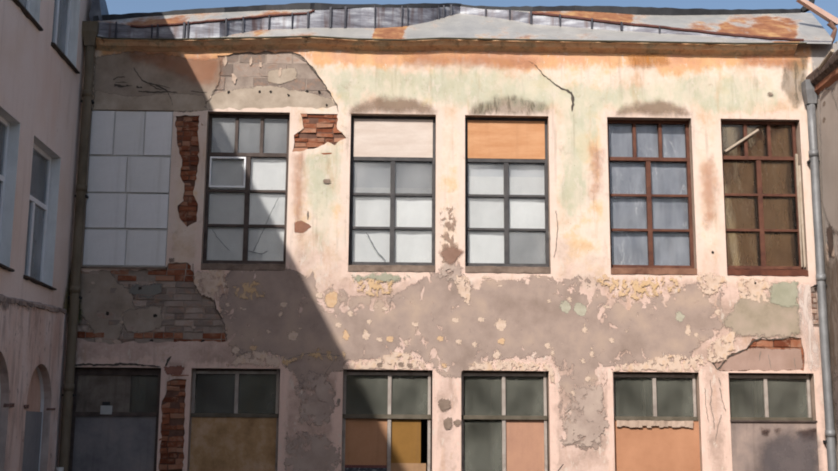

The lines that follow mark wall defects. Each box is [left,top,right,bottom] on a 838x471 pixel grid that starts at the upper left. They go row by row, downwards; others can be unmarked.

rust [532,12,804,42]
crack [113,68,206,105]
damp [351,98,430,113]
damp [472,96,542,114]
crack [529,61,574,111]
damp [619,101,687,114]
spalling [91,51,346,231]
peeling [77,206,819,451]